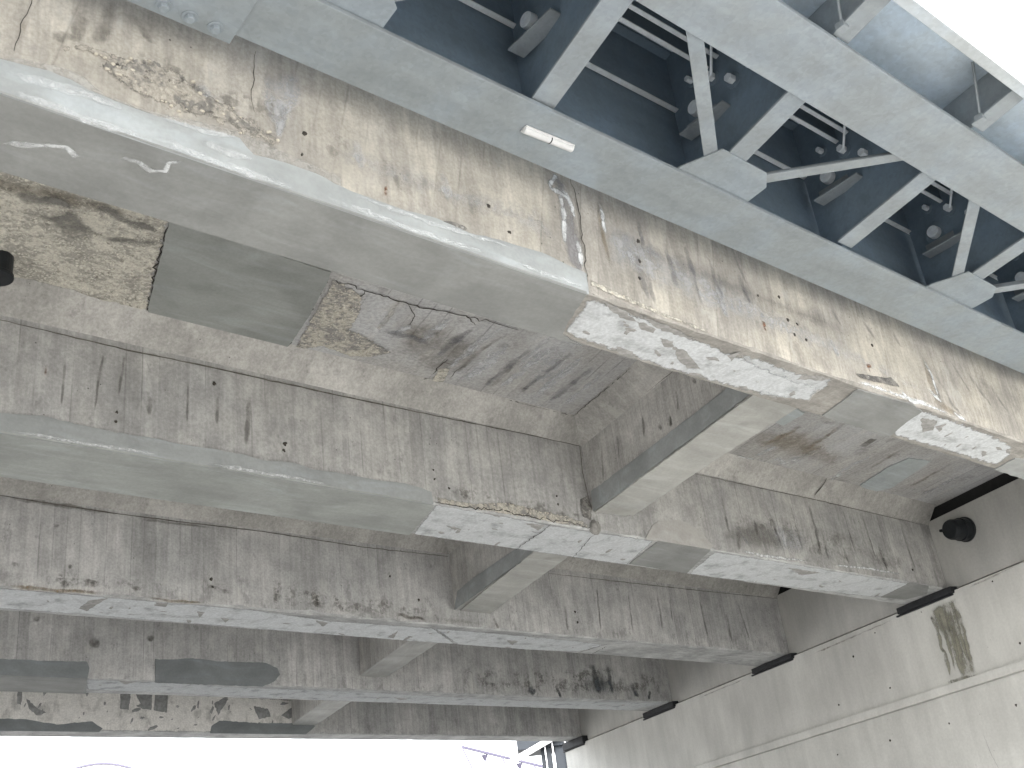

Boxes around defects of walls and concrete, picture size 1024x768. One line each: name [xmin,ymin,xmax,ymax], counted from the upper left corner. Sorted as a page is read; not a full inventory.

spalling [0,171,168,309]
crack [147,227,168,311]
spalling [296,281,391,357]
crack [309,280,517,330]
crack [570,179,589,289]
peeling [567,281,830,400]
peeling [895,412,1011,464]
peeling [415,496,652,564]
damp [921,602,973,683]
peeling [0,680,662,732]